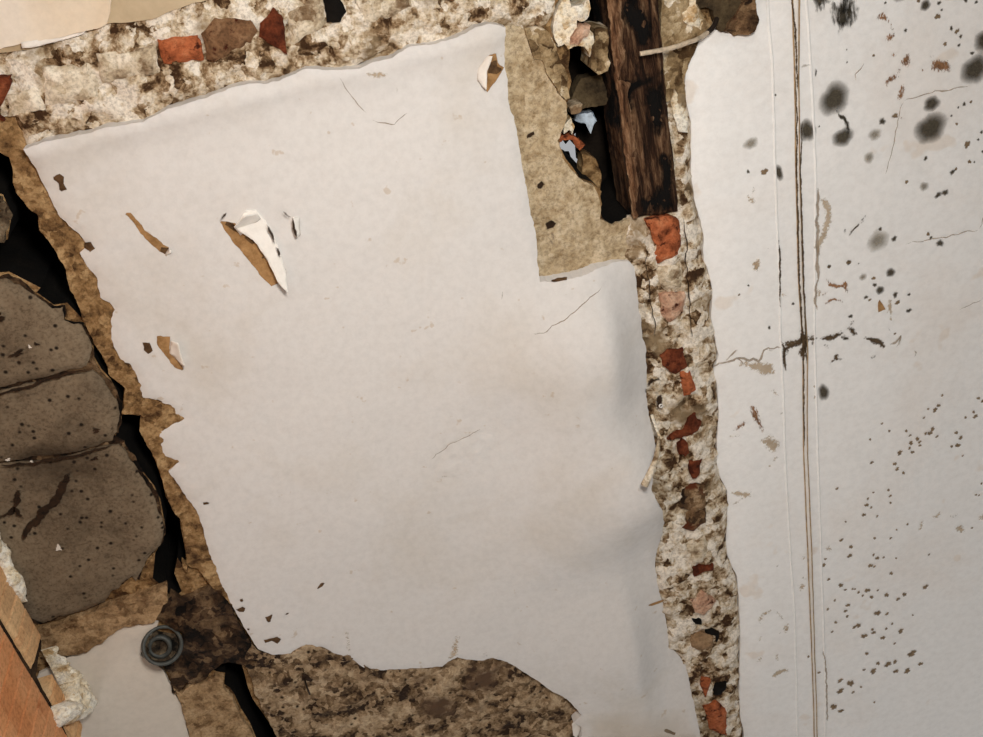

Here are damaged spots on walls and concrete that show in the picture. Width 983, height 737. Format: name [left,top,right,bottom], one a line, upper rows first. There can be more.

peeling [0,0,112,49]
spalling [696,0,759,36]
water stain [815,0,858,28]
water stain [964,33,983,80]
flaking render [477,25,631,282]
water stain [822,85,851,144]
crack [886,87,960,172]
water stain [917,98,972,140]
peeling [234,210,288,293]
crack [910,219,983,243]
crack [714,281,901,366]
spalling [245,637,579,737]